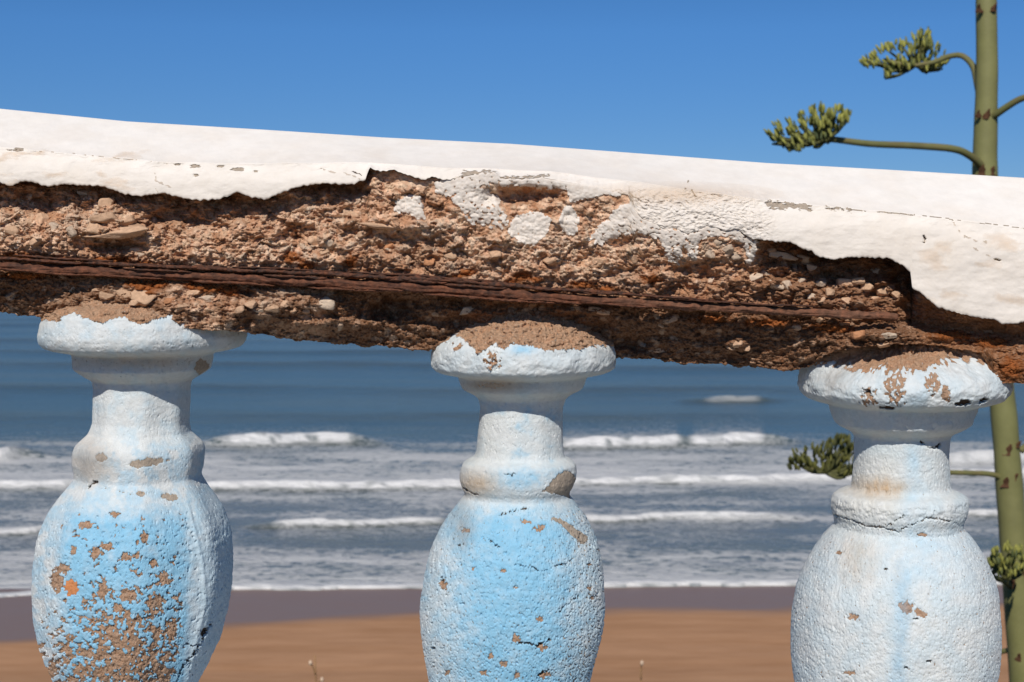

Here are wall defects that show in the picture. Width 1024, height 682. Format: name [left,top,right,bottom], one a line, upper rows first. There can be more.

rust [284,251,313,269]
rust [125,279,167,295]
rust [184,282,239,296]
spalling [0,168,1024,407]
rust [508,271,541,283]
rust [640,275,659,283]
rust [746,319,792,327]
peeling [129,457,170,469]
crack [835,514,951,531]
peeling [422,471,604,682]
peeling [39,512,184,682]